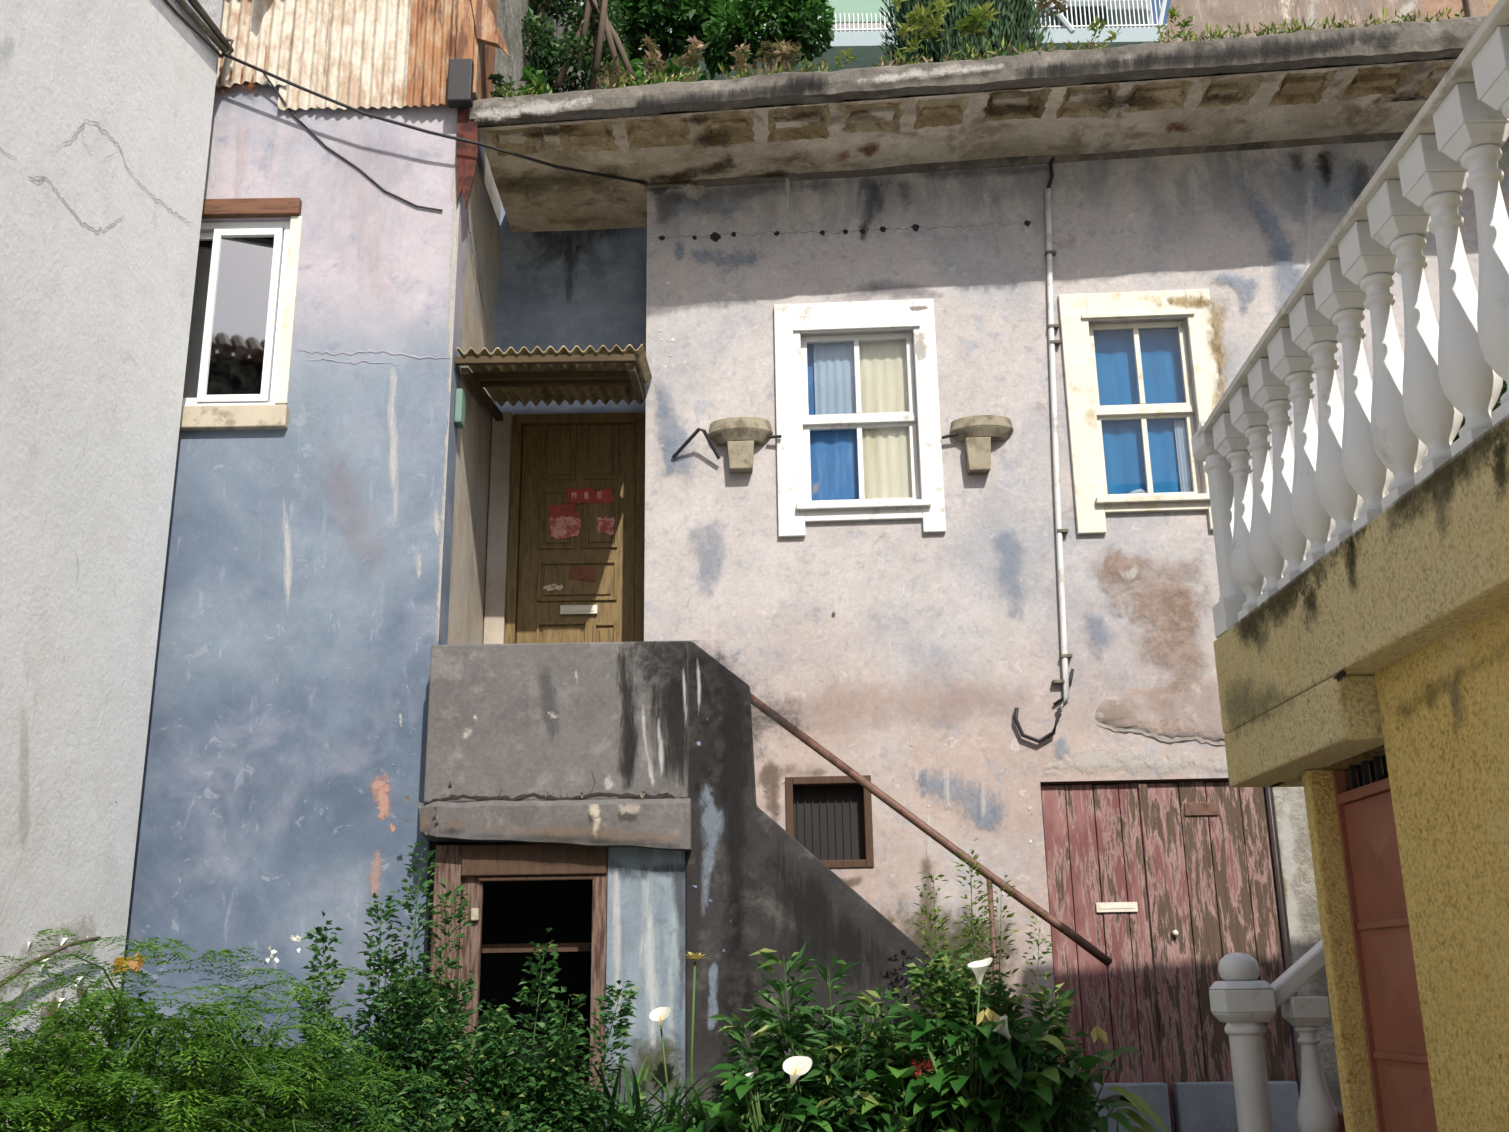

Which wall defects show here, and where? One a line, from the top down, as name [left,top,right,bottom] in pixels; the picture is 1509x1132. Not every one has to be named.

crack [0,119,192,232]
water stain [640,131,735,186]
water stain [756,172,789,209]
water stain [860,180,884,239]
water stain [1388,416,1508,527]
water stain [1235,525,1366,644]
water stain [618,655,688,786]
water stain [590,804,600,830]
water stain [620,805,639,813]
peeling [920,770,997,858]
peeling [369,851,382,895]
water stain [721,684,753,1062]